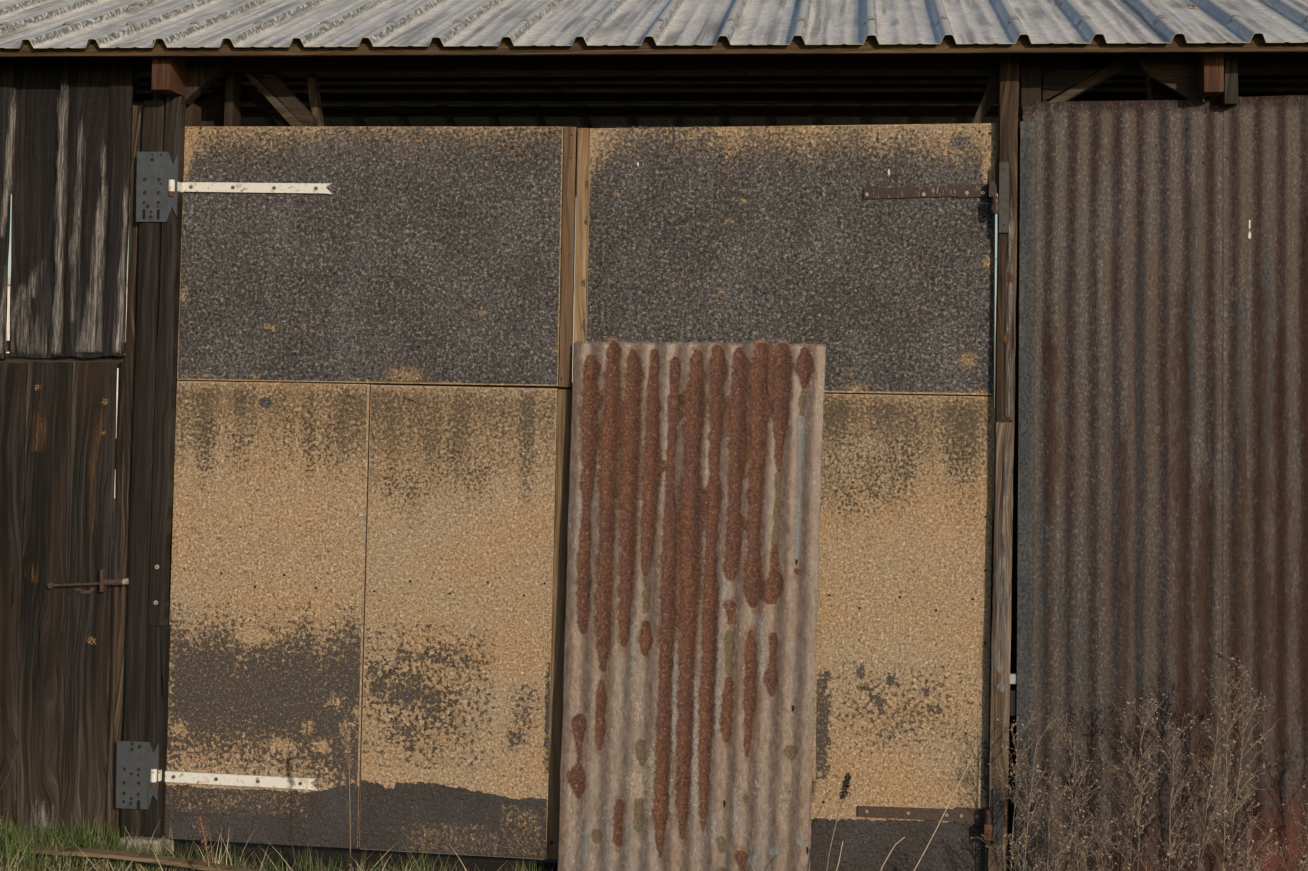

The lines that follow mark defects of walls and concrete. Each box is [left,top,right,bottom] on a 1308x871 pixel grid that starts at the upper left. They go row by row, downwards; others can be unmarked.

corrosion [1274,217,1308,745]
corrosion [567,338,815,862]
leakage [166,602,551,789]
leakage [816,661,982,779]
corrosion [717,836,749,871]
corrosion [1225,806,1308,871]